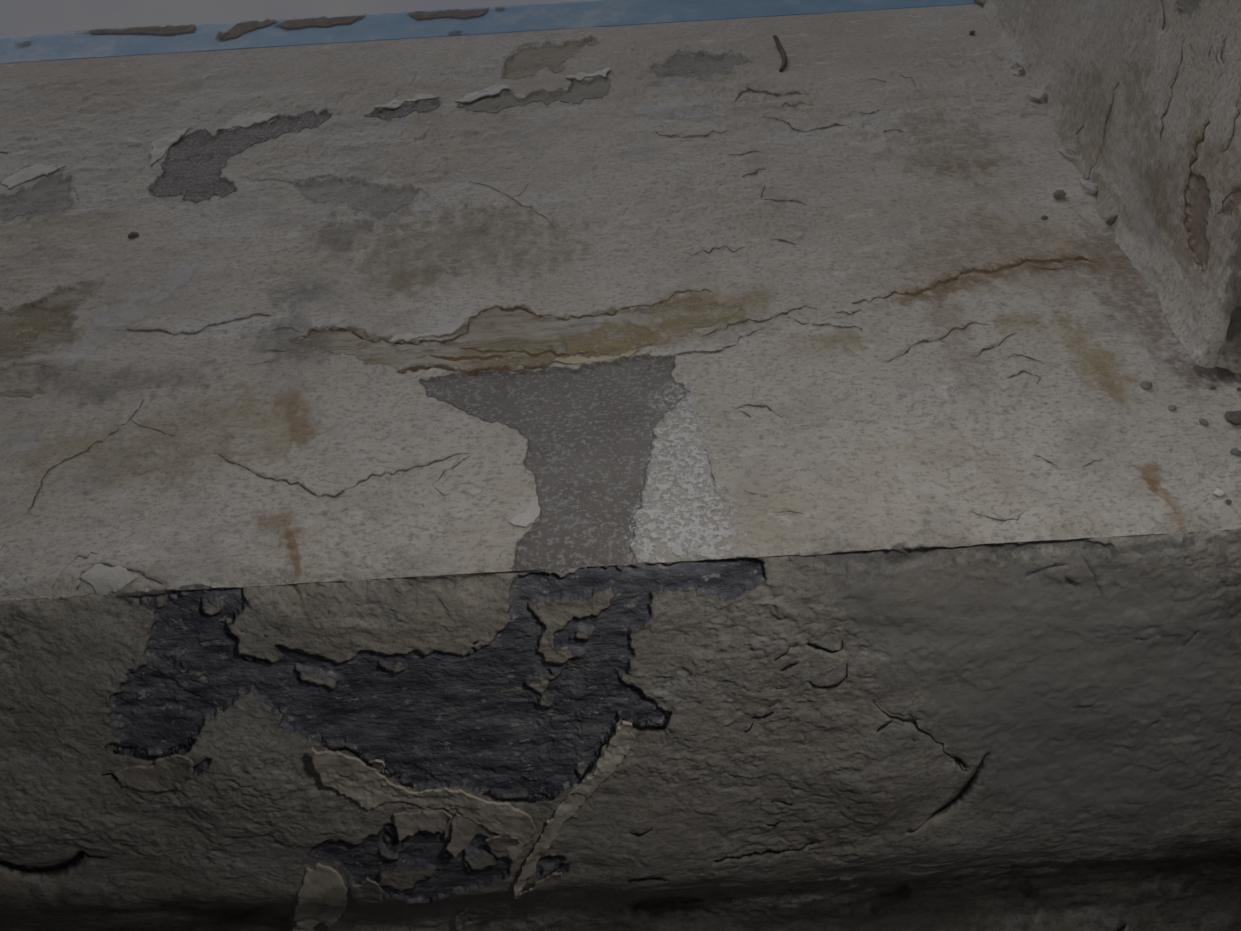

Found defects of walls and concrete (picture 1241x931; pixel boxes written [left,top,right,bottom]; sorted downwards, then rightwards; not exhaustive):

peeling [364,93,440,120]
peeling [455,37,611,113]
peeling [149,109,341,203]
spalling [0,286,95,371]
crack [670,257,1095,357]
crack [27,400,172,512]
crack [219,453,470,498]
peeling [84,294,767,931]
crack [873,701,986,818]
crack [0,850,108,875]